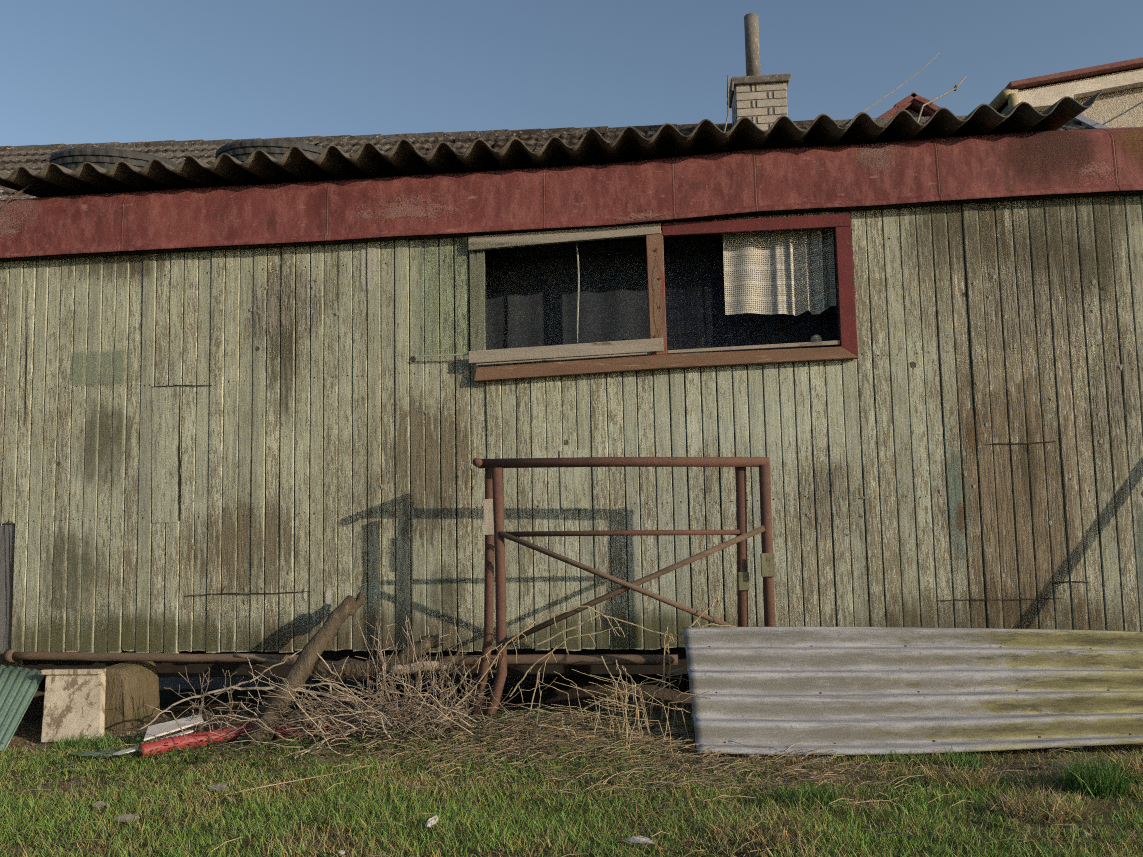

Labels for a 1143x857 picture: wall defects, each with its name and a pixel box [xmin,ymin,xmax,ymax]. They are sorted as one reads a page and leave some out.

leakage [271,268,298,407]
peeling [244,269,341,343]
leakage [82,405,131,482]
peeling [185,502,308,604]
peeling [375,392,475,556]
peeling [795,461,868,541]
leakage [949,460,970,557]
peeling [939,231,1107,628]
peeling [1085,343,1143,459]